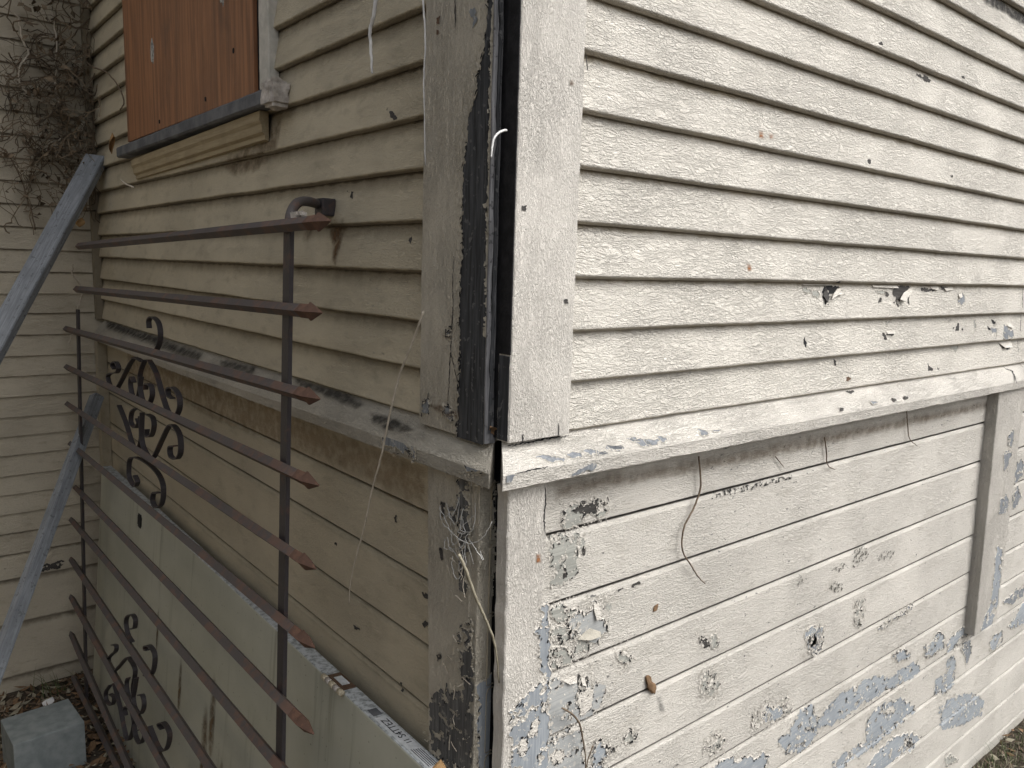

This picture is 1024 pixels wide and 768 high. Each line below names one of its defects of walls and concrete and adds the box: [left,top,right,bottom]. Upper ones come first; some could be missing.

peeling [419,0,504,445]
peeling [878,283,1014,350]
peeling [423,617,492,768]
peeling [432,464,515,597]
peeling [507,435,668,768]
peeling [694,546,1024,768]
peeling [998,429,1024,521]